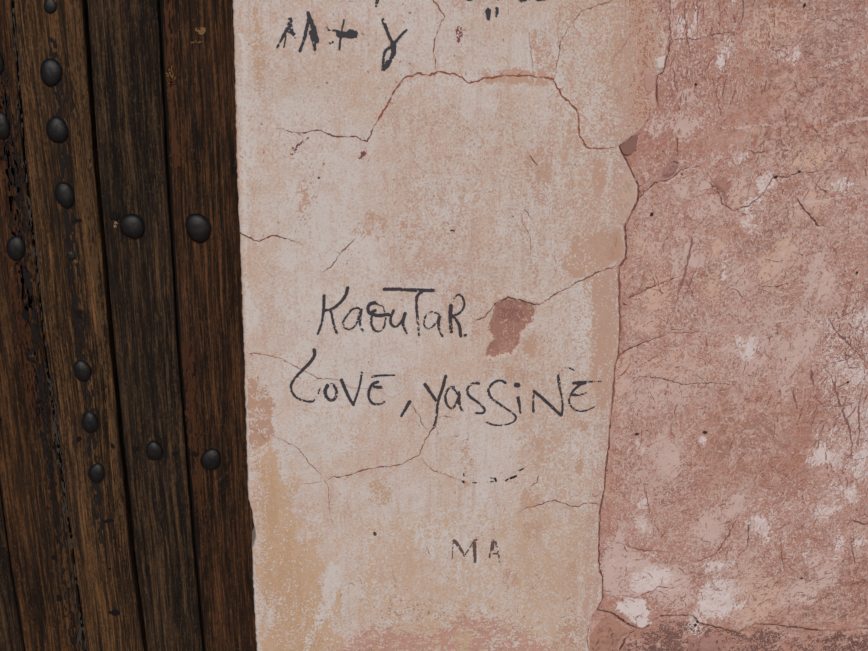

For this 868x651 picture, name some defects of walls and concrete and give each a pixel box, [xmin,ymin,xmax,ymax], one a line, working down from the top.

spalling [620,134,638,155]
crack [239,232,303,245]
spalling [485,298,535,357]
crack [249,0,838,633]
spalling [625,620,868,651]